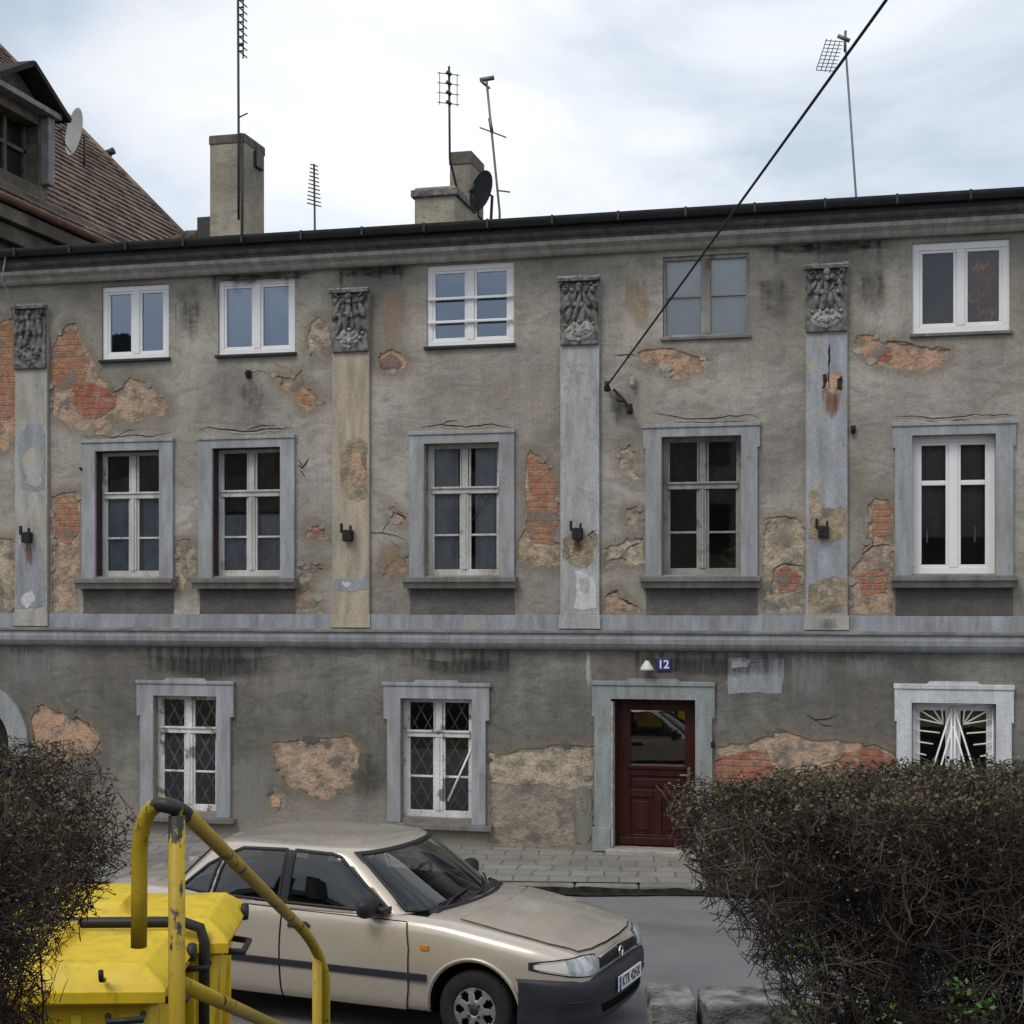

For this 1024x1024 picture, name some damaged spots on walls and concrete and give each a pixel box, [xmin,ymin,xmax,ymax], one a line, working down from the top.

flaking render [49,321,170,437]
crack [201,425,295,434]
crack [417,420,512,430]
crack [825,344,833,389]
corrosion [827,396,837,414]
flaking render [851,331,952,374]
flaking render [515,448,645,615]
flaking render [759,490,895,616]
flaking render [28,703,102,764]
flaking render [270,734,360,802]
flaking render [486,741,594,849]
flaking render [713,727,896,803]